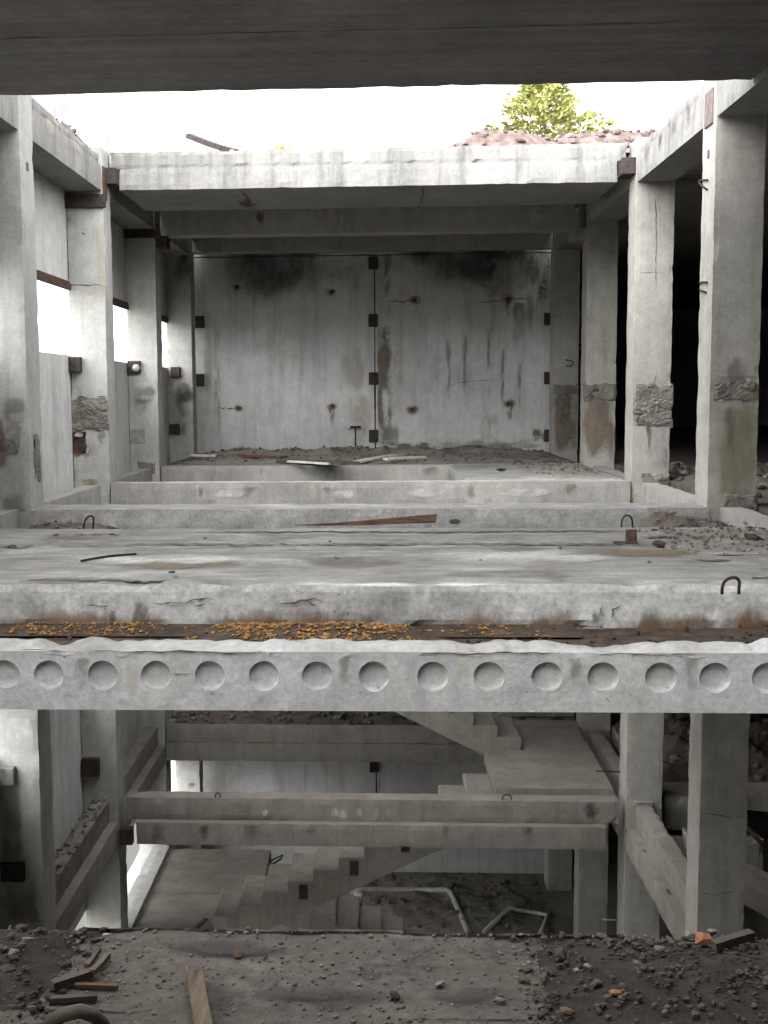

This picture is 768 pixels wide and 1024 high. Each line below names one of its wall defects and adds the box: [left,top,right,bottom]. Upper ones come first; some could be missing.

leakage [239,253,315,295]
leakage [406,250,525,282]
spalling [71,396,109,456]
leakage [533,388,614,455]
spalling [632,384,674,428]
spalling [714,378,759,402]
crack [21,578,214,607]
crack [281,598,321,606]